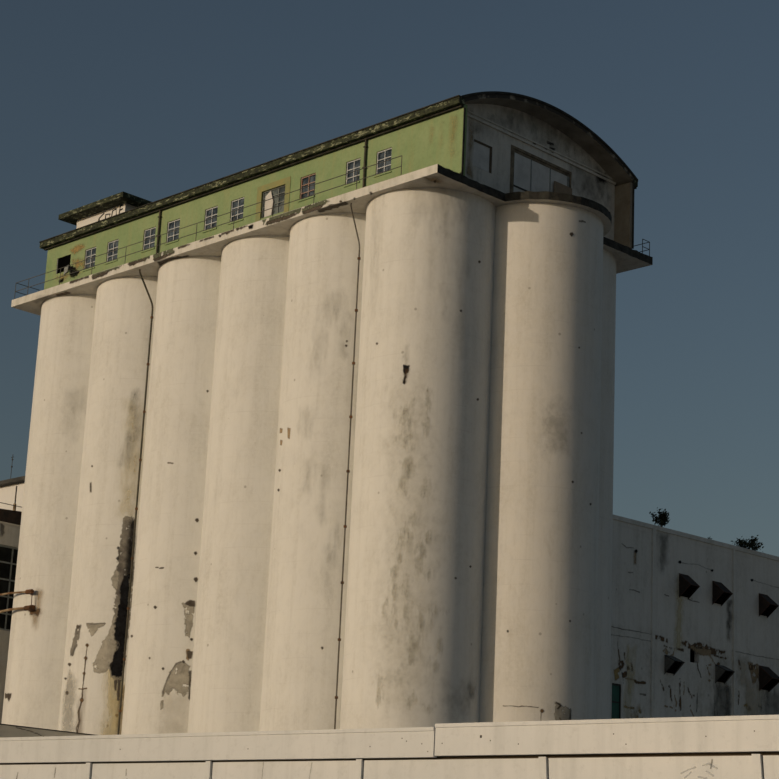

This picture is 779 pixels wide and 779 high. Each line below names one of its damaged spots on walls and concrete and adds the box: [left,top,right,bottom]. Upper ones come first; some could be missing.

spalling [68,516,135,700]
peeling [161,600,195,709]
spalling [655,635,727,682]
water stain [104,671,123,735]
spalling [554,702,571,720]
water stain [714,684,730,716]